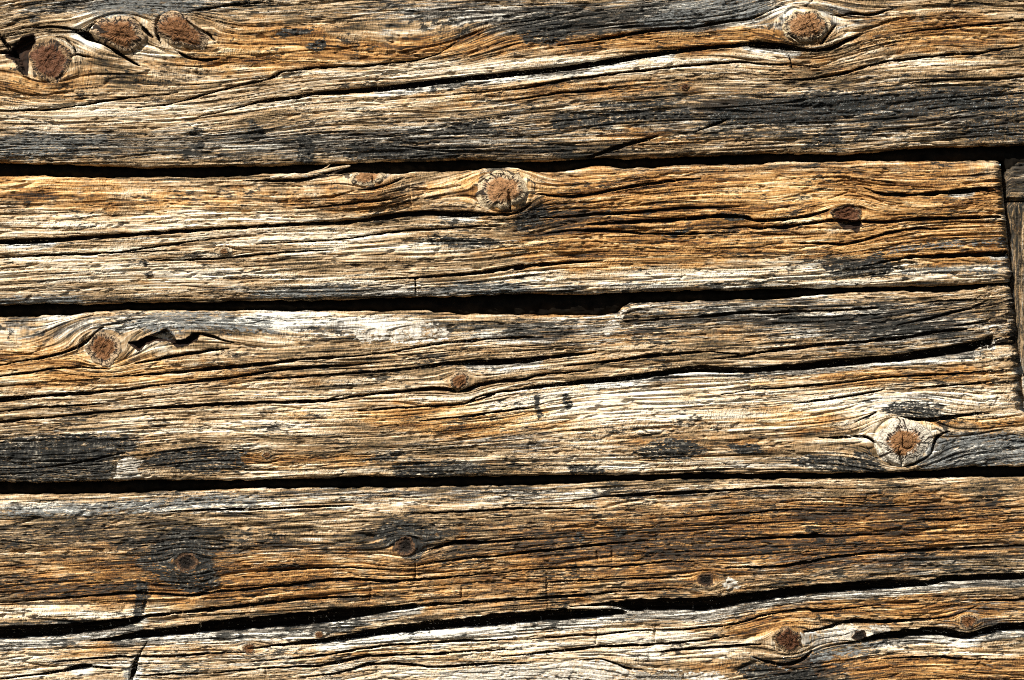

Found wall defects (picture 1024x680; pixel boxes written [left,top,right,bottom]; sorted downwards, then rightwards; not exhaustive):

crack [0,299,1019,468]
crack [0,486,1024,679]